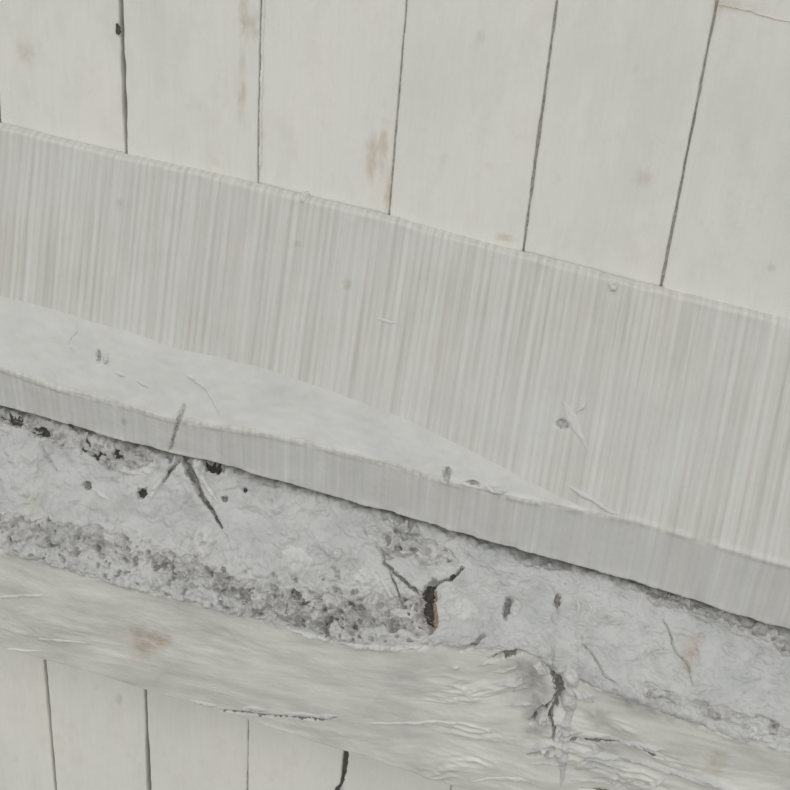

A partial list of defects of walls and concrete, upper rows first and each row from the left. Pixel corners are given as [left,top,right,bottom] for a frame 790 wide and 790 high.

crack [718,4,790,22]
spalling [0,409,152,475]
crack [168,410,221,525]
spalling [363,514,459,567]
spalling [0,510,427,639]
crack [383,556,461,631]
spalling [646,591,790,656]
crack [532,669,615,742]
spalling [642,681,790,740]